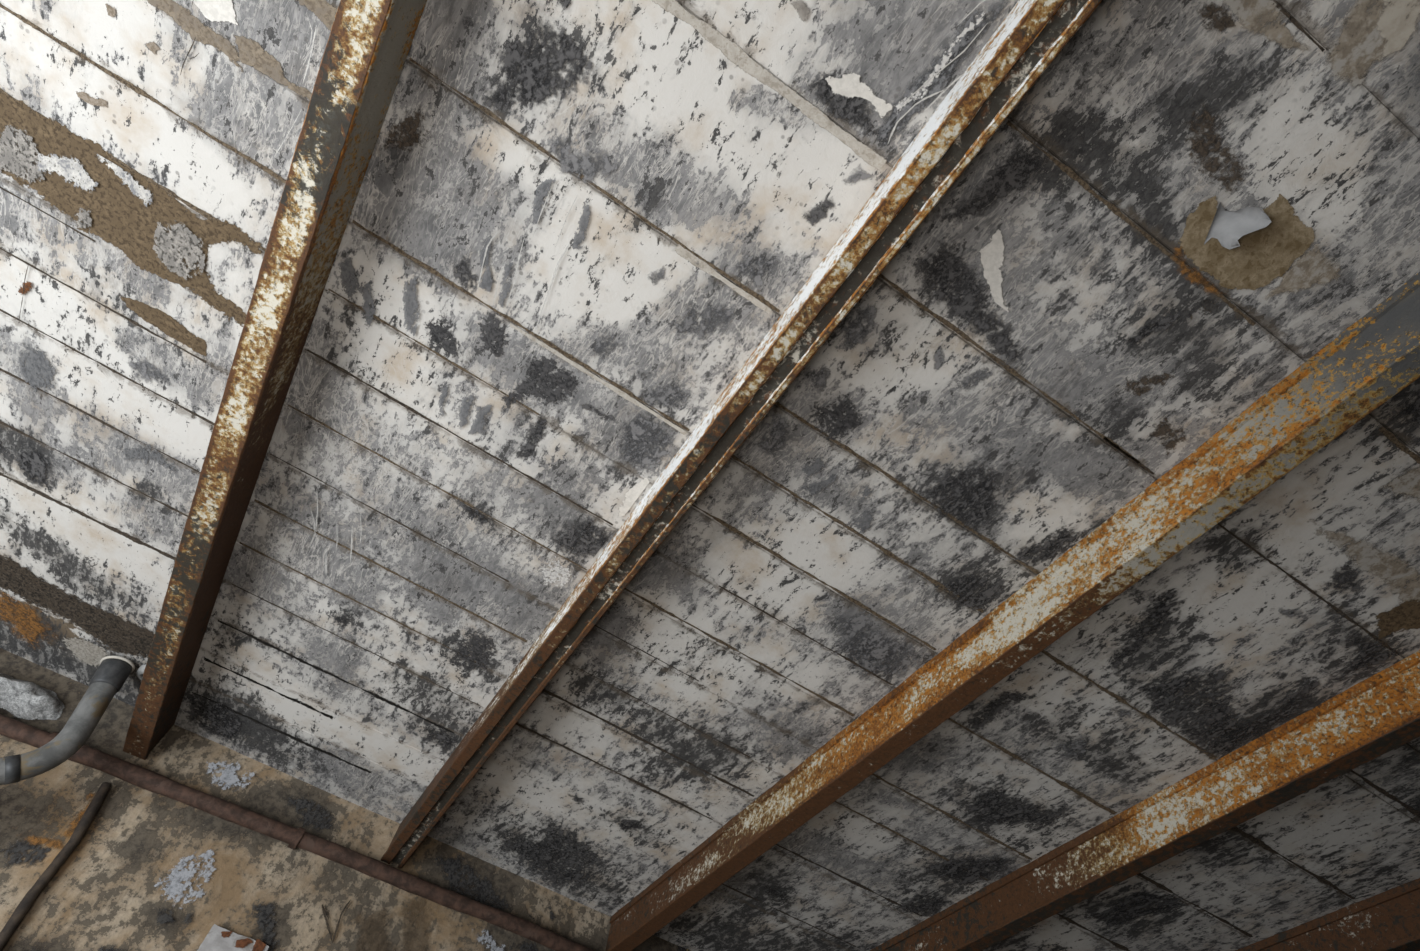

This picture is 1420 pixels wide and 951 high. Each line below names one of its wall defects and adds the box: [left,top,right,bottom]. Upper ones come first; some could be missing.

water stain [482,23,593,111]
peeling [825,72,892,118]
water stain [808,0,1007,145]
peeling [0,91,263,327]
peeling [120,295,207,356]
water stain [402,277,463,362]
water stain [454,236,513,357]
water stain [531,128,618,249]
water stain [803,199,834,226]
water stain [913,144,1046,388]
flaking render [1174,194,1341,299]
water stain [437,356,690,470]